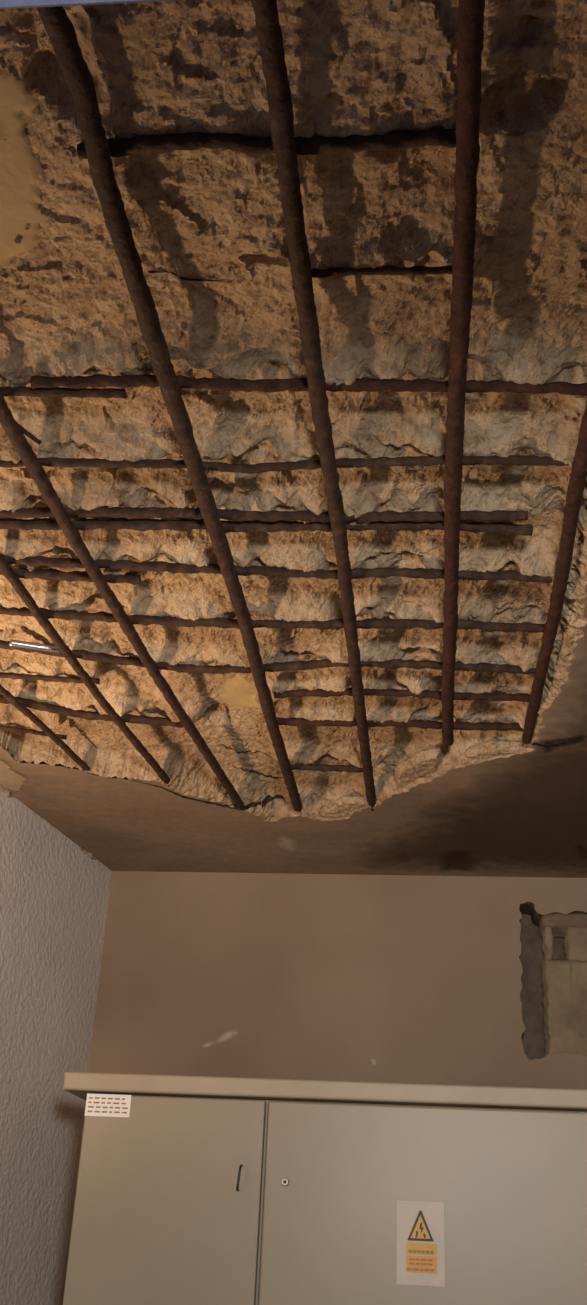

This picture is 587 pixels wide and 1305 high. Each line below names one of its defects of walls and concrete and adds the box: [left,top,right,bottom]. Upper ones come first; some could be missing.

spalling [0,0,587,822]